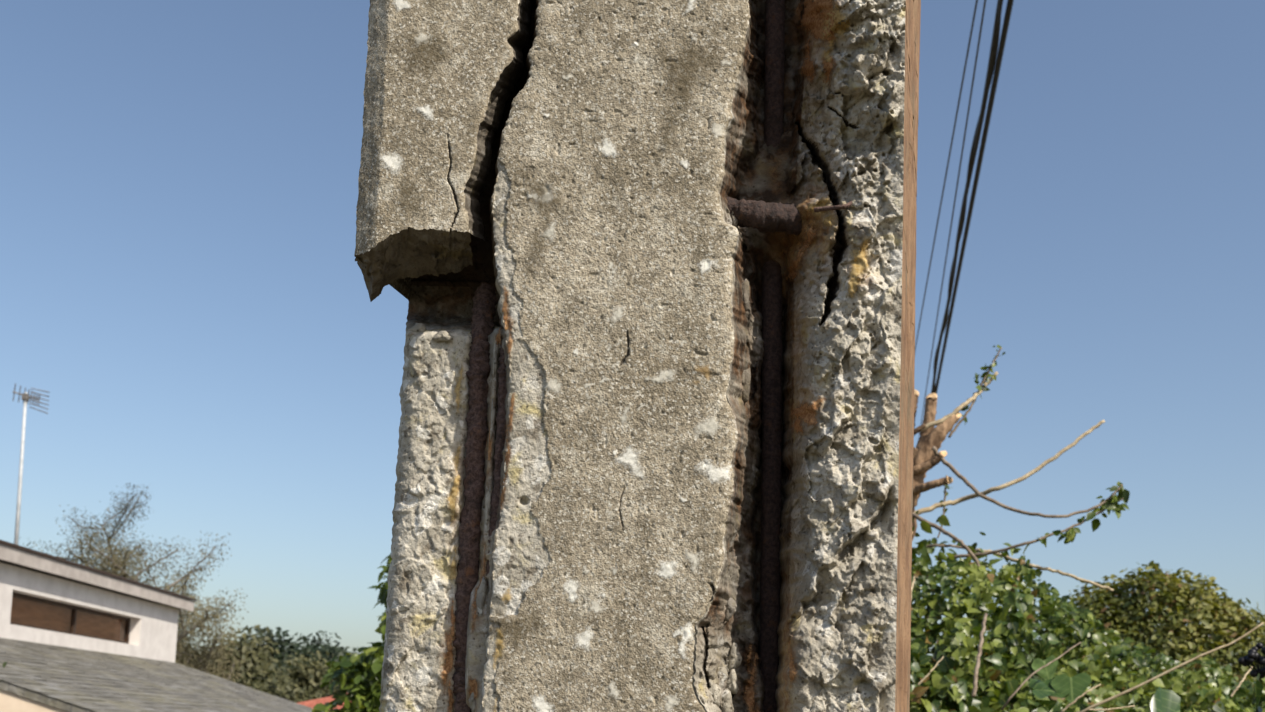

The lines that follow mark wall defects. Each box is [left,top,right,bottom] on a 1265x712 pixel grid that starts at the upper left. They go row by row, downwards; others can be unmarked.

corrosion [795,0,850,82]
crack [411,0,539,287]
crack [827,106,859,129]
crack [795,121,848,327]
corrosion [496,288,513,353]
spalling [692,0,906,712]
corrosion [448,446,460,517]
spalling [379,159,552,712]
corrosion [488,393,515,508]
corrosion [441,600,456,712]
corrosion [744,647,759,712]